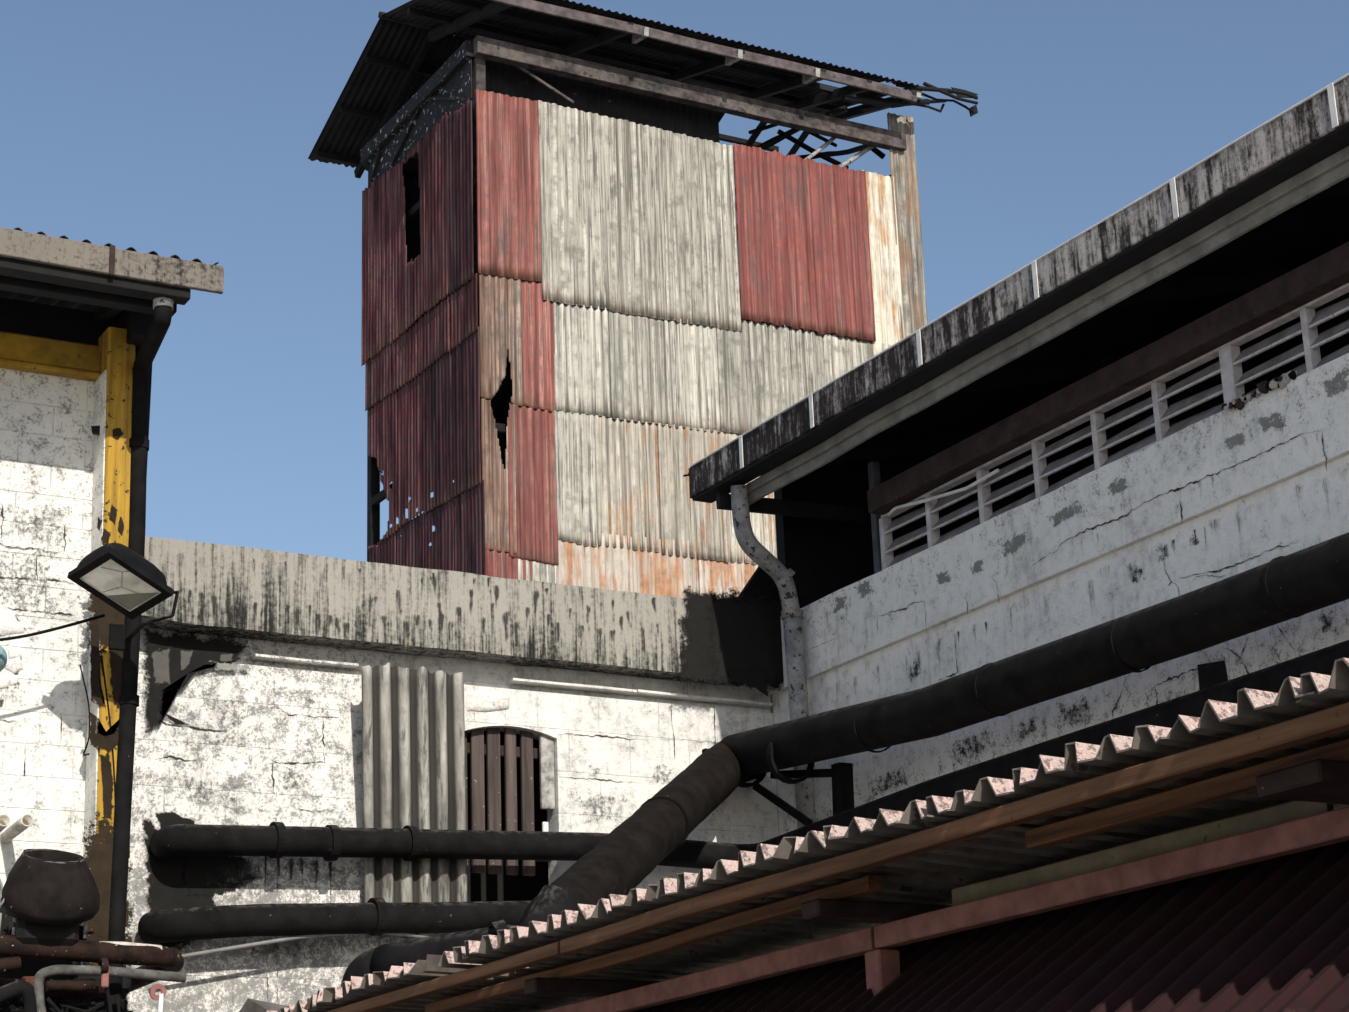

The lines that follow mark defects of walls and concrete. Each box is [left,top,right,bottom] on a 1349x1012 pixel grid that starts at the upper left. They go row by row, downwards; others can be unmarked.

leakage [0,505,63,616]
peeling [97,505,124,543]
leakage [188,590,257,618]
leakage [285,605,350,638]
leakage [396,573,659,652]
leakage [678,586,784,697]
crack [1033,431,1327,565]
crack [1161,541,1299,596]